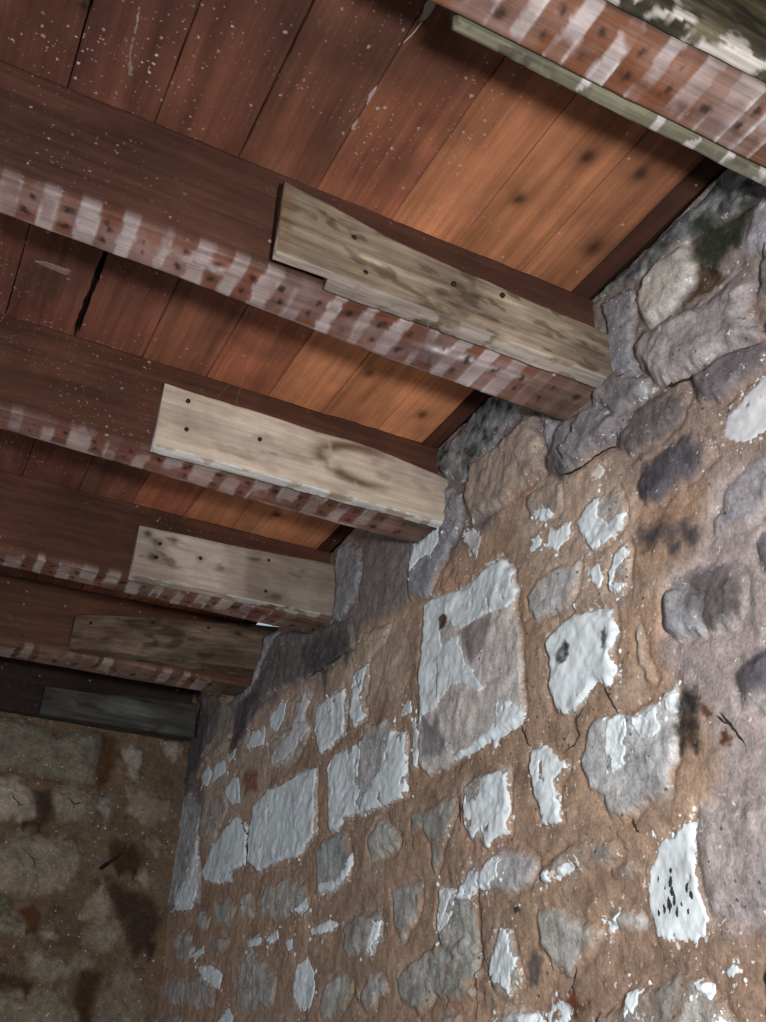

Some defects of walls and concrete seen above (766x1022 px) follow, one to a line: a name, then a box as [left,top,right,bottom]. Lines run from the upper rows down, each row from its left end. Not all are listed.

crack [562,433,618,475]